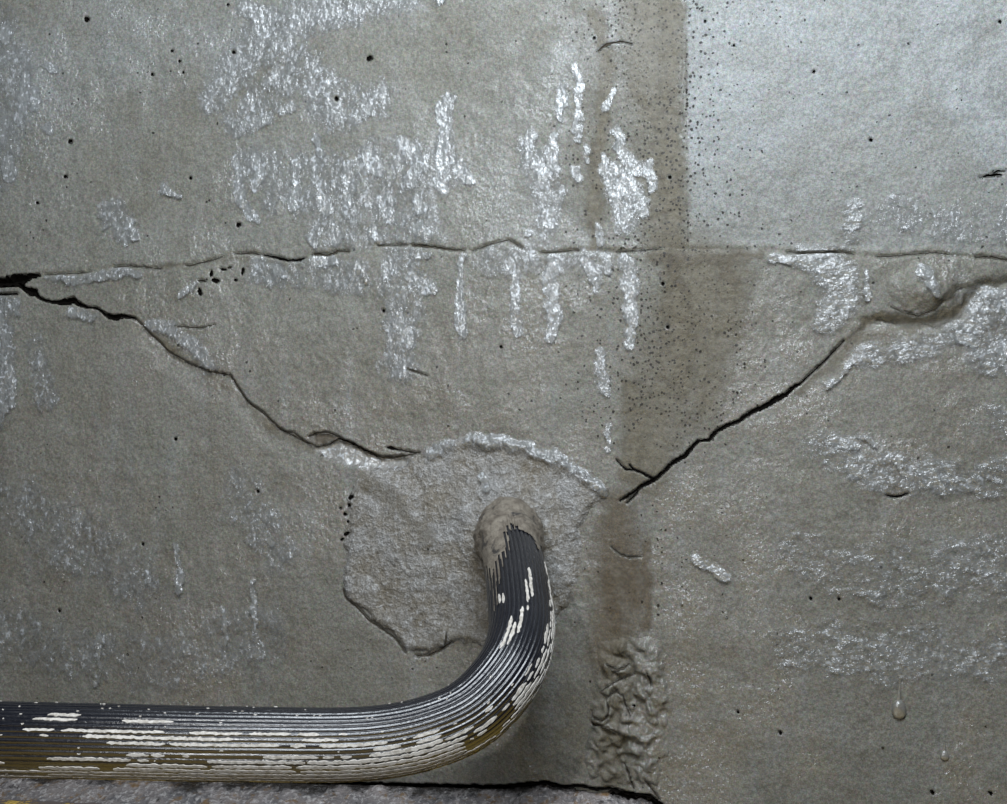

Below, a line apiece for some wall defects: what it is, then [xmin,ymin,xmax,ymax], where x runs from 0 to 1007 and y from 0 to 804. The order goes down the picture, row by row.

water stain [199,0,476,381]
crack [186,250,349,266]
crack [378,240,578,253]
crack [788,249,854,257]
crack [881,252,1007,261]
crack [0,272,420,458]
crack [616,340,845,503]
crack [509,763,663,804]